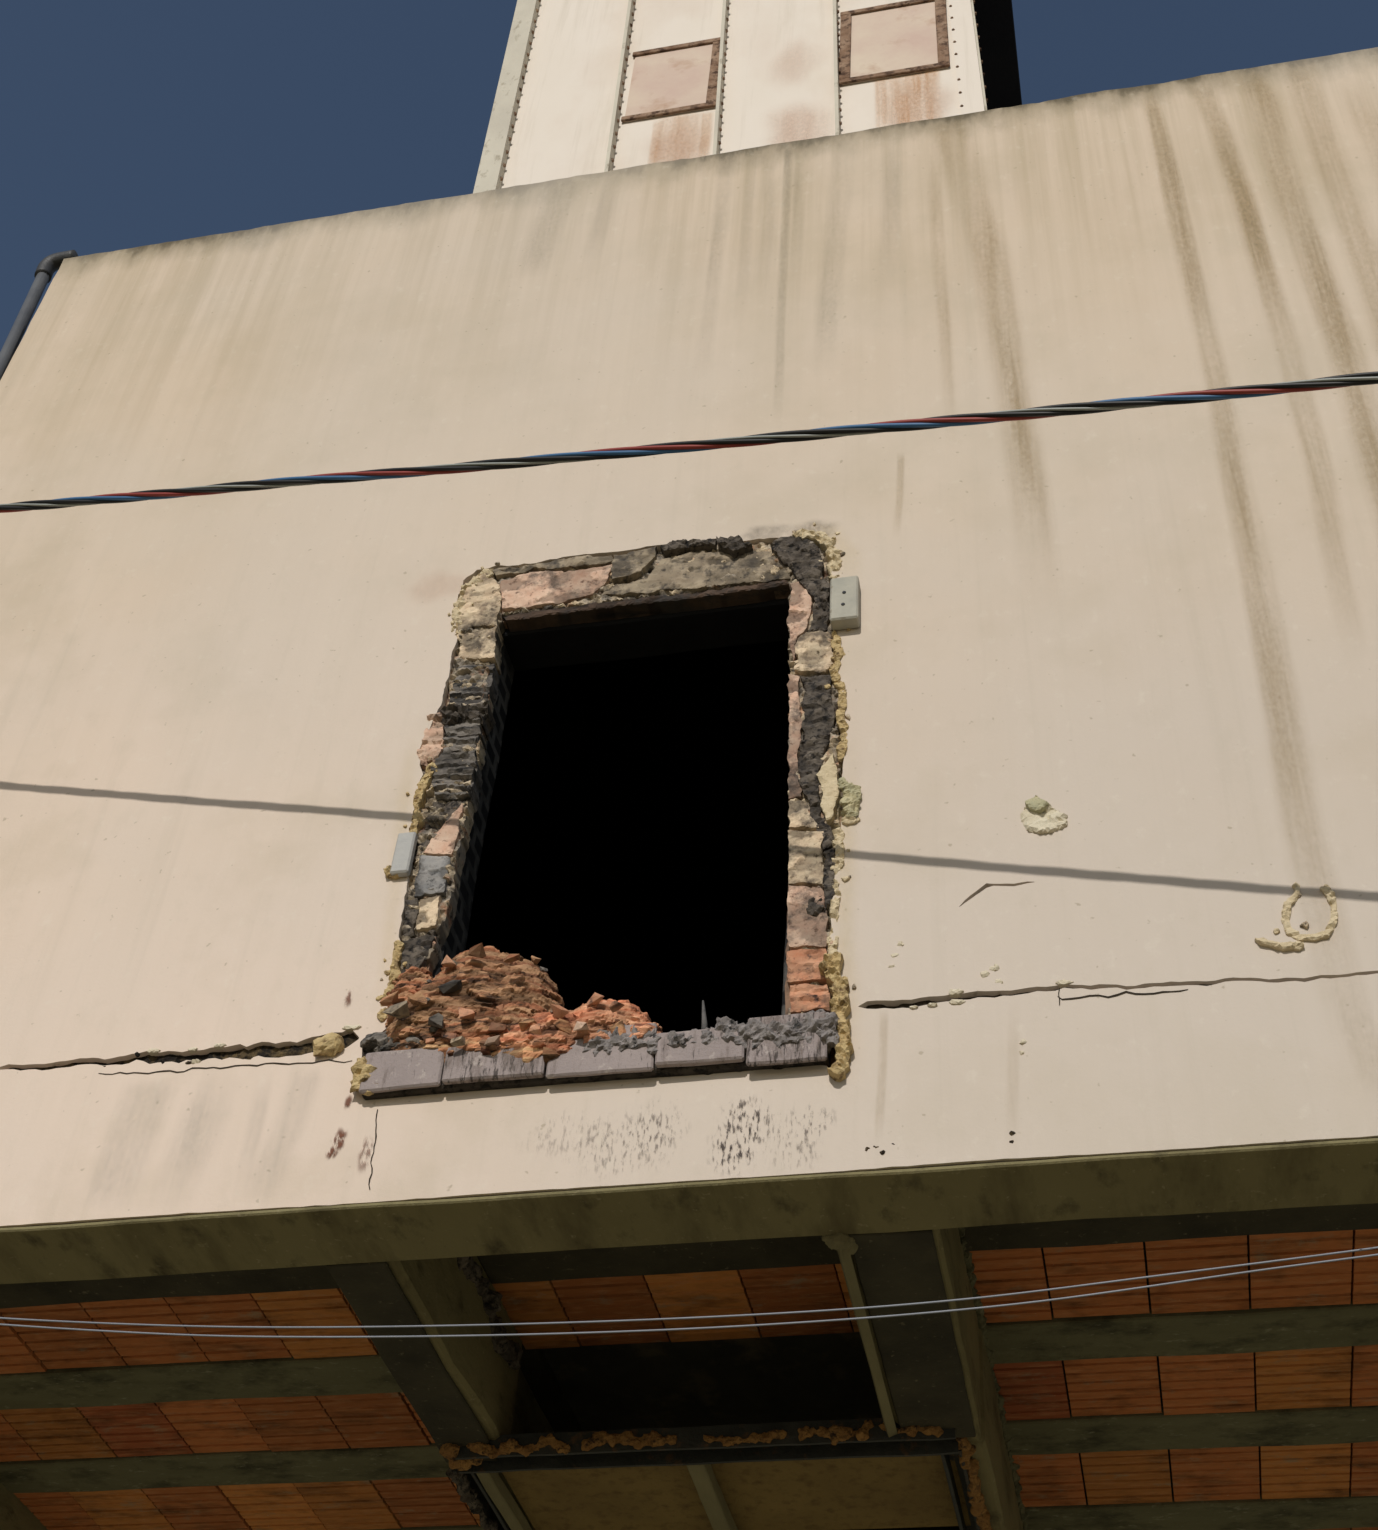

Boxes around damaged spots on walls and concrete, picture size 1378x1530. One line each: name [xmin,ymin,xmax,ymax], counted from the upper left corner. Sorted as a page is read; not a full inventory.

spalling [376,522,856,1014]
crack [865,979,1209,1009]
crack [9,1024,362,1074]